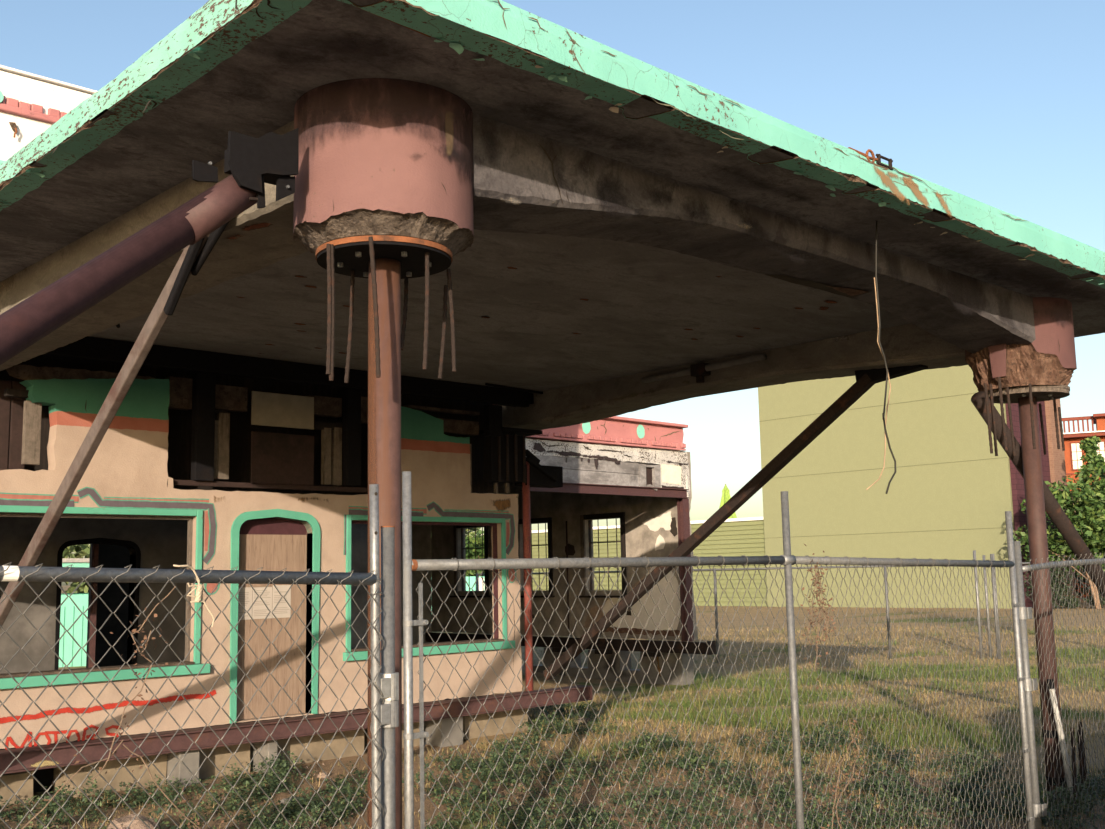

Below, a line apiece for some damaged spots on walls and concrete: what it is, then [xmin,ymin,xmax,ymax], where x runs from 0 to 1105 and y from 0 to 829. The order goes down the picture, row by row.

crack [399,0,439,16]
crack [496,0,616,75]
spalling [0,0,262,190]
crack [652,85,743,119]
spalling [348,0,1105,285]
leakage [597,179,627,212]
spalling [294,208,474,256]
spalling [965,343,1077,392]
peeling [533,443,621,465]